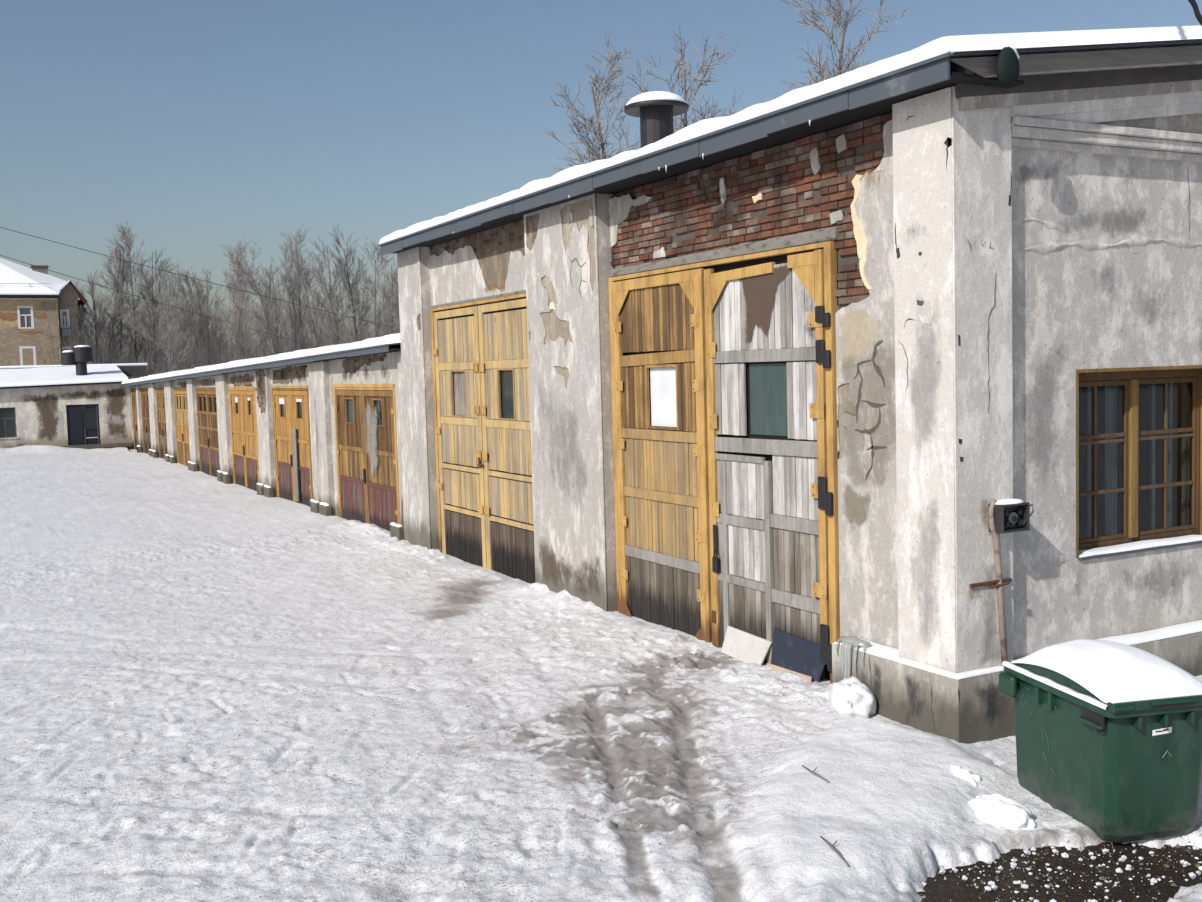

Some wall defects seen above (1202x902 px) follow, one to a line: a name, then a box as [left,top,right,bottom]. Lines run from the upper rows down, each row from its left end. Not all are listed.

flaking render [430,213,540,291]
flaking render [561,198,596,289]
flaking render [608,112,892,312]
flaking render [530,276,574,345]
damp [33,389,127,440]
flaking render [555,366,569,388]
crack [854,318,913,481]